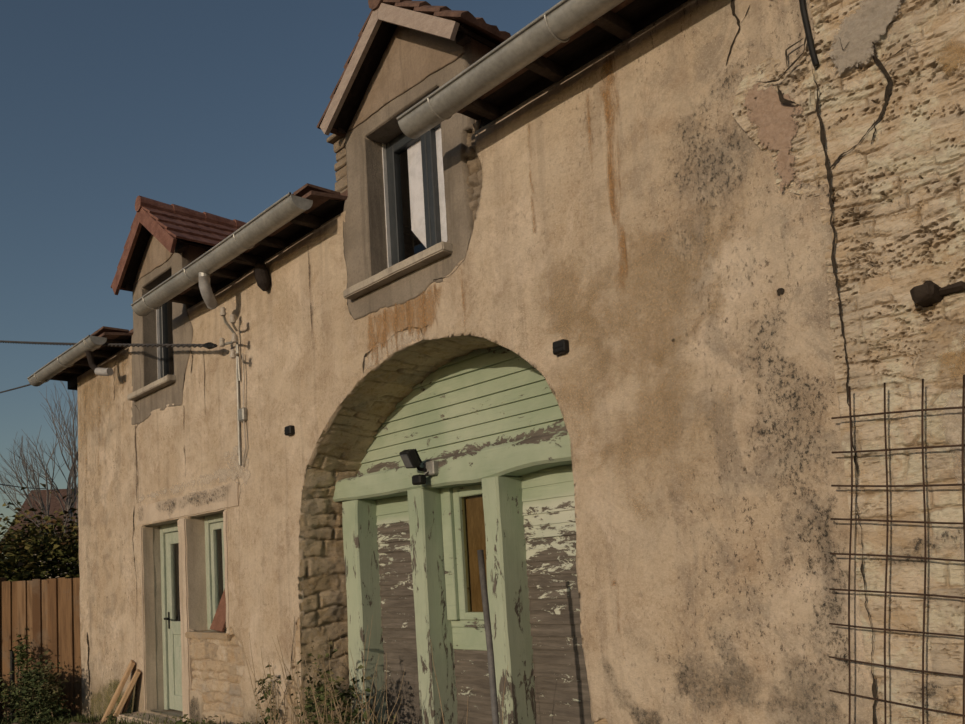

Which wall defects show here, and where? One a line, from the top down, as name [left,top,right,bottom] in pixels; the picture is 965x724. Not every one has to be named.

crack [726,0,750,64]
flaking render [464,120,484,228]
rust [603,59,620,213]
damp [673,105,742,222]
flaking render [732,50,820,197]
crack [757,37,915,406]
damp [749,315,848,667]
crack [852,440,877,724]